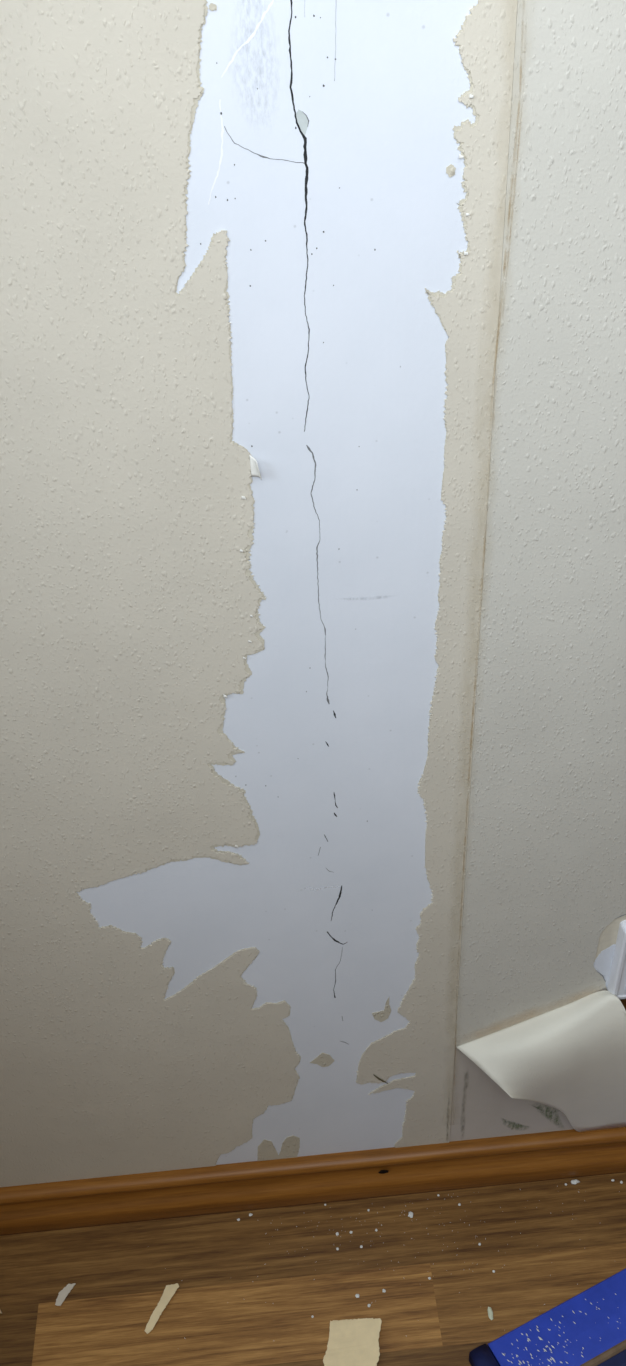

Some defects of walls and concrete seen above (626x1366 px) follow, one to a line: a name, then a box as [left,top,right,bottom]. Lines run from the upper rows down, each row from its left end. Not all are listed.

peeling [76,0,480,1165]
crack [224,0,336,747]
crack [318,793,348,1044]
peeling [449,944,626,1142]